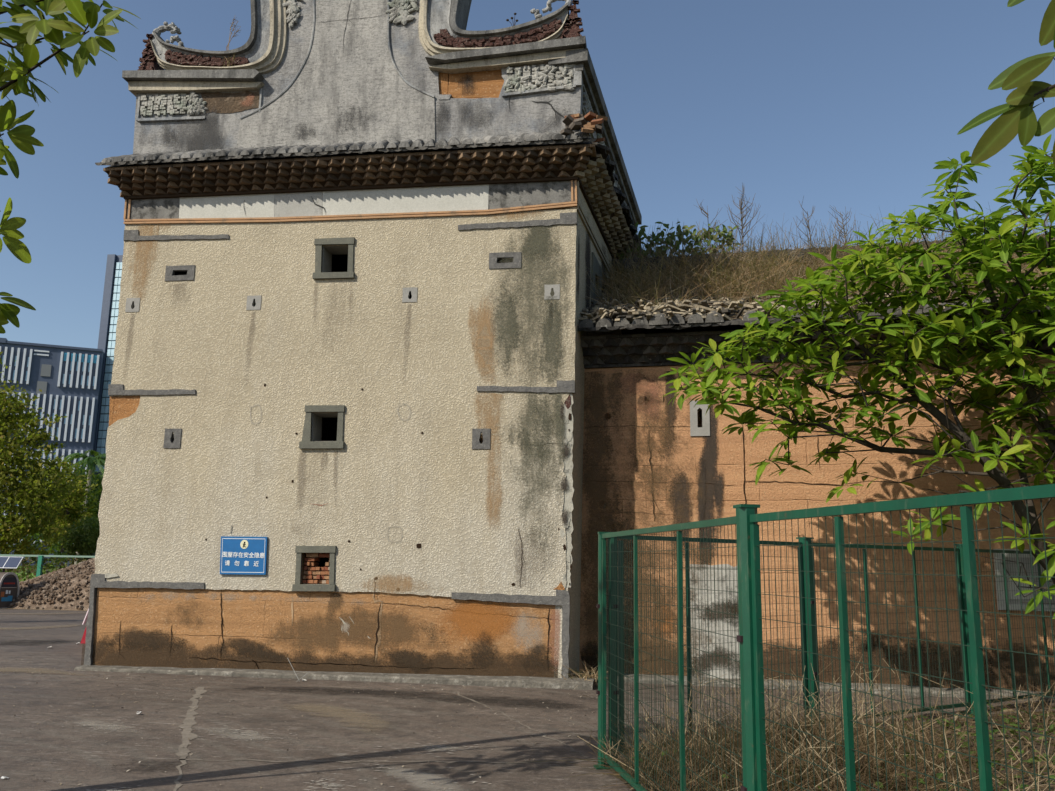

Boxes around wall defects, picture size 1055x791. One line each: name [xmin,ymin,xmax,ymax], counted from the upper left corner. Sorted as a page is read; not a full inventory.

spalling [439,70,504,100]
leakage [496,297,518,367]
leakage [541,298,561,381]
spalling [109,396,140,426]
leakage [518,394,569,457]
leakage [580,371,740,676]
leakage [81,593,558,678]
crack [169,579,476,670]
leakage [763,640,802,681]
leakage [818,634,964,688]
leakage [982,645,1055,692]